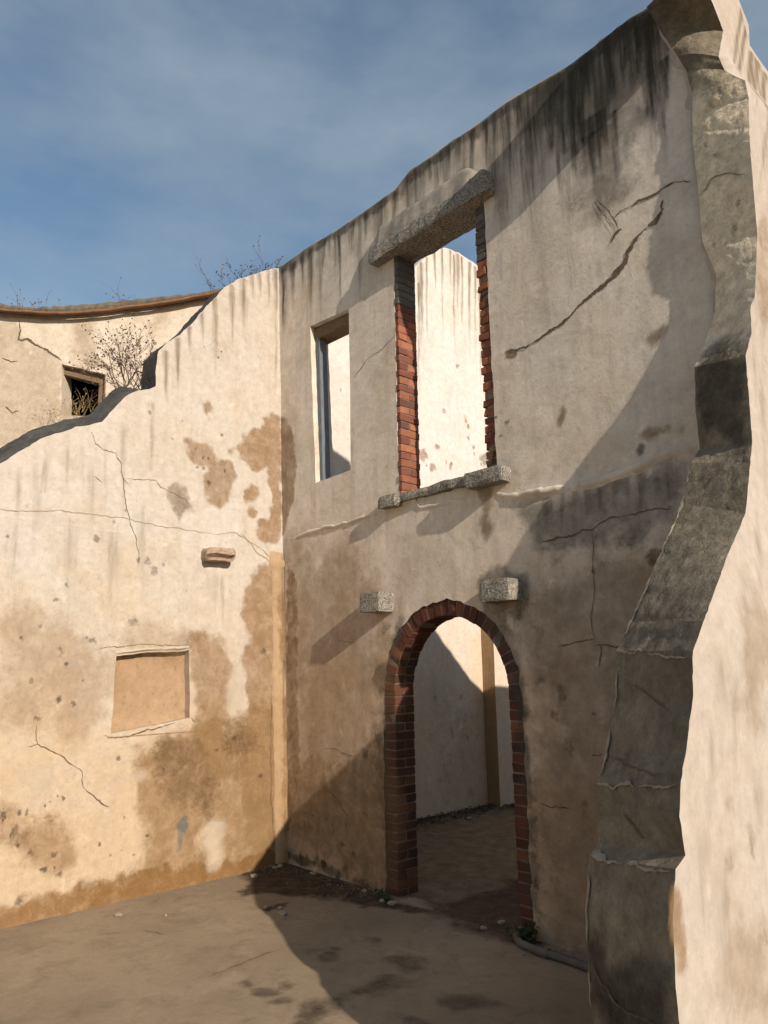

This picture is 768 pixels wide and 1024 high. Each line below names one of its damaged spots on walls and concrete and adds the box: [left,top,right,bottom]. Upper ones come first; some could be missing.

water stain [536,15,668,133]
crack [507,172,743,352]
crack [3,322,61,362]
crack [2,443,269,563]
water stain [185,415,295,542]
crack [541,508,671,666]
crack [29,726,109,807]
water stain [0,566,340,929]